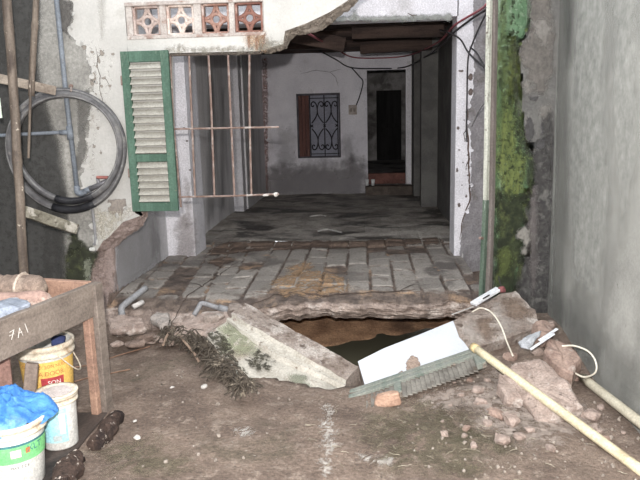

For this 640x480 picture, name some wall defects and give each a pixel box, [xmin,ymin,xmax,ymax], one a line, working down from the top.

peeling [0,84,19,275]
peeling [18,87,39,106]
peeling [12,0,114,97]
peeling [21,98,148,310]
spalling [262,0,359,194]
peeling [456,0,486,272]
peeling [516,226,530,255]
water stain [512,0,558,313]
water stain [570,0,608,289]
water stain [615,0,636,210]